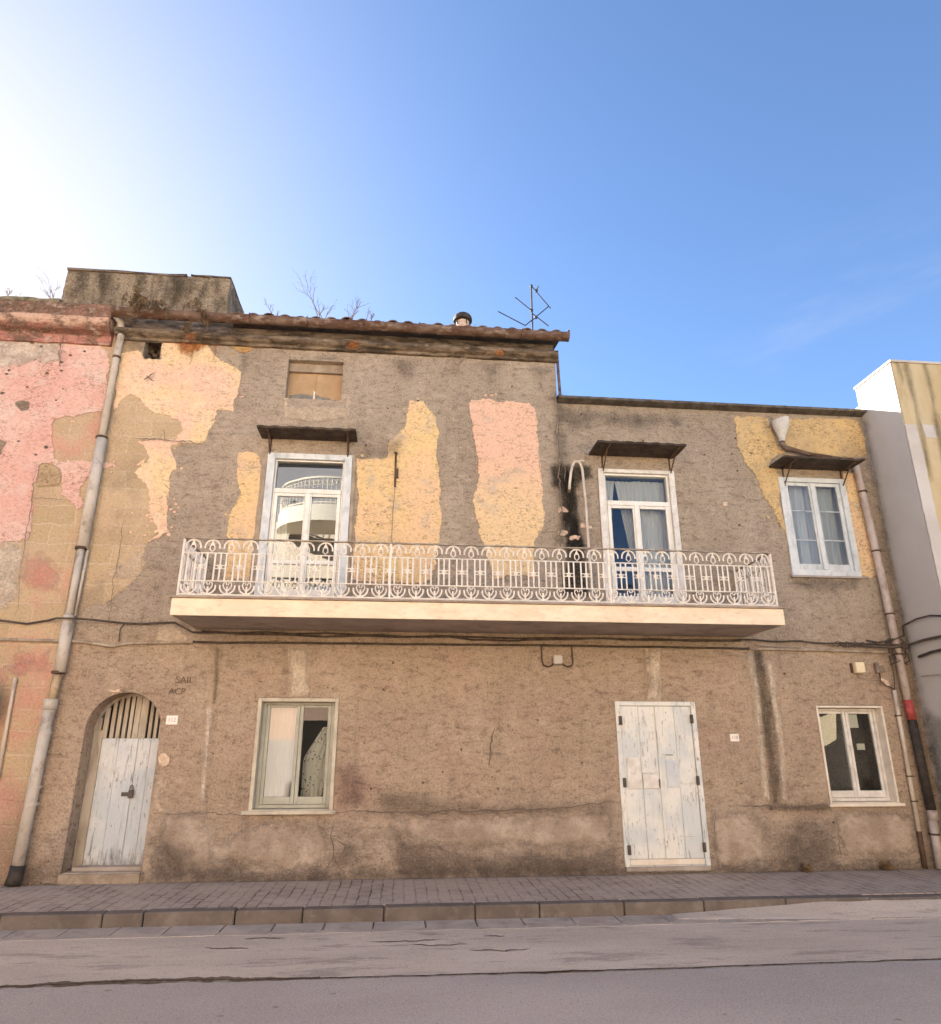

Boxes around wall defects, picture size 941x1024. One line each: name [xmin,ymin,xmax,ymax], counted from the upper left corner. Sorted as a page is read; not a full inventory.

peeling [0,339,253,617]
peeling [224,451,263,581]
peeling [353,398,447,590]
peeling [469,393,547,579]
damp [552,464,591,595]
peeling [731,416,871,555]
peeling [843,473,877,578]
crack [317,801,616,873]